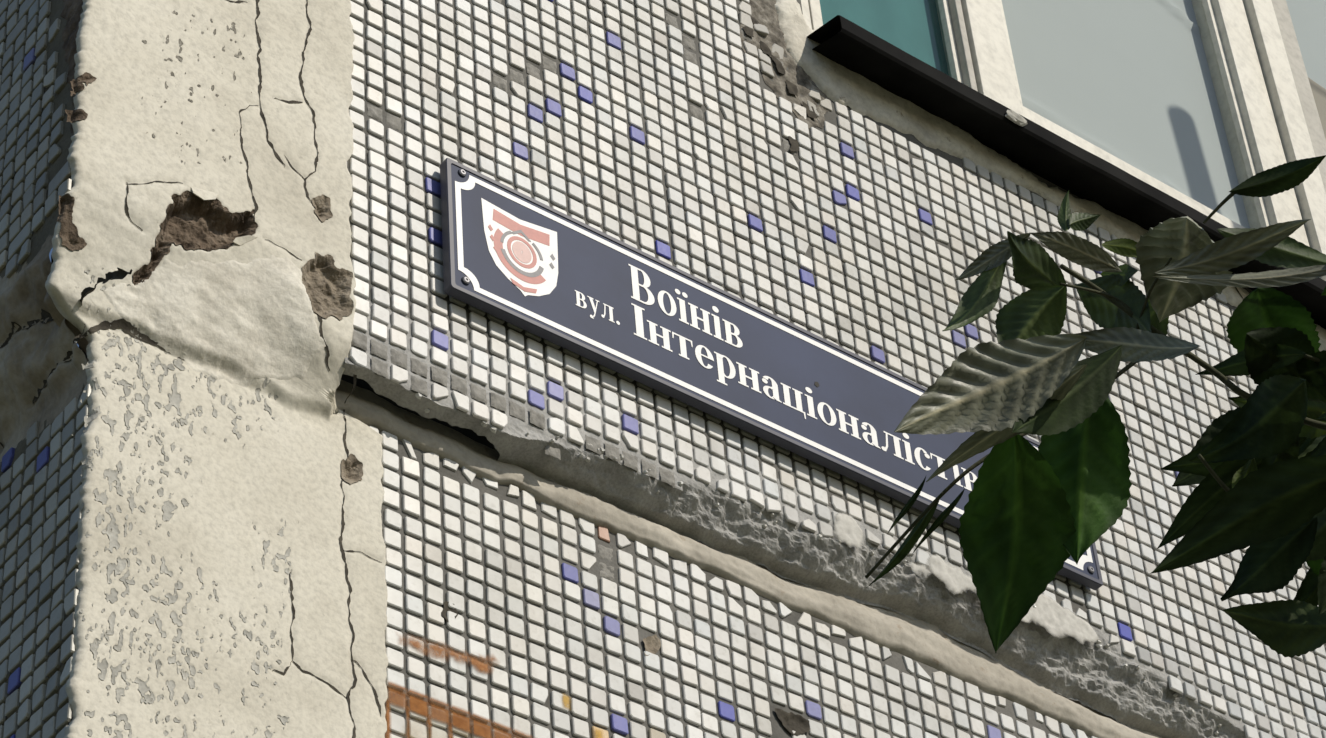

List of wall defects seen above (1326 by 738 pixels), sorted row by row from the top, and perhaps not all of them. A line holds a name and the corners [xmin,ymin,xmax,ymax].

spalling [739,0,829,129]
crack [228,0,319,260]
spalling [783,136,799,155]
crack [125,181,183,231]
spalling [82,187,258,290]
crack [274,314,381,738]
spalling [302,252,1326,738]
corrosion [401,639,495,673]
corrosion [386,682,531,738]